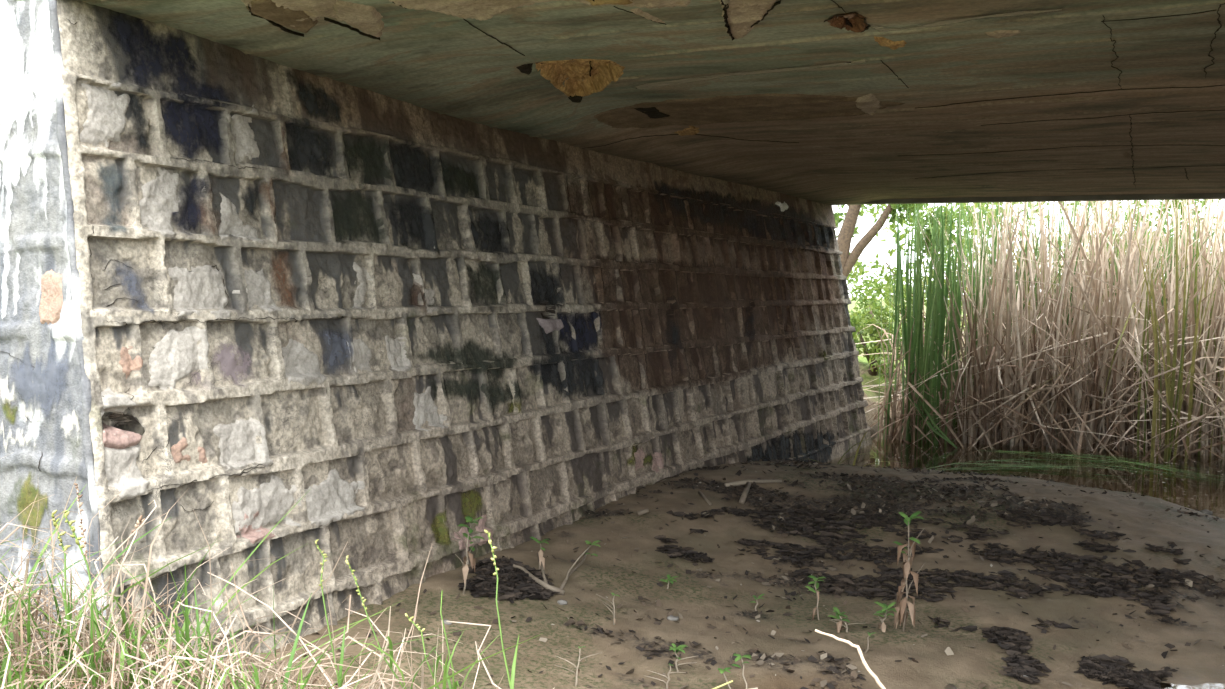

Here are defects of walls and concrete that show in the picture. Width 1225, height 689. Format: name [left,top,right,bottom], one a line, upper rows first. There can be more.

peeling [241,0,384,37]
crack [593,0,666,25]
peeling [718,0,777,39]
crack [721,0,781,40]
leakage [91,0,233,158]
crack [882,3,1225,187]
leakage [285,72,487,254]
leakage [11,332,69,416]
flaking render [119,265,282,391]
leakage [419,340,529,411]
leakage [530,269,604,398]
spalling [100,387,150,500]